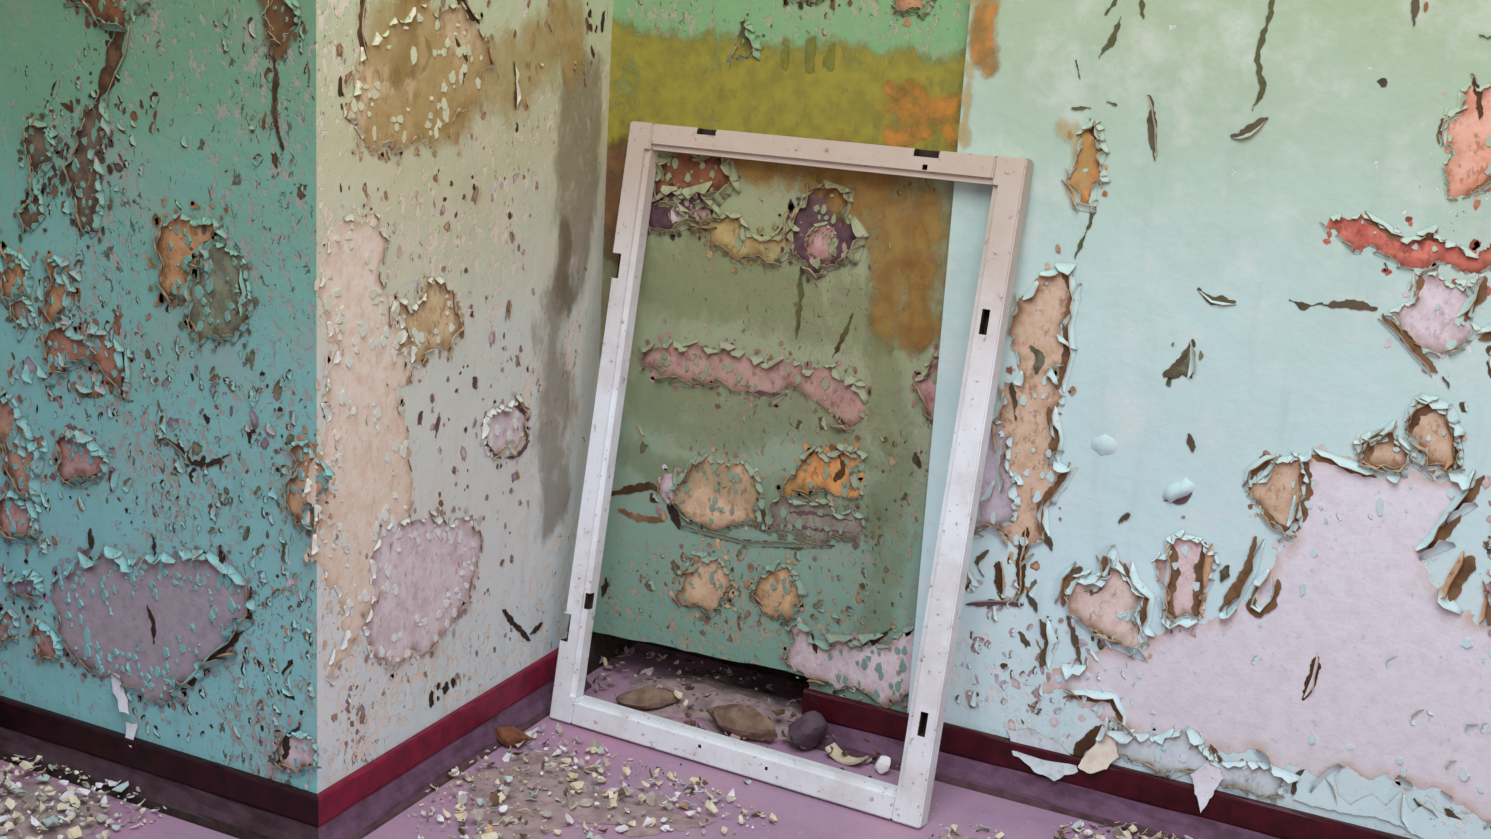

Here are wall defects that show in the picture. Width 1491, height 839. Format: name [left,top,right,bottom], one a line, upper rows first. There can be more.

peeling [513,0,605,133]
peeling [727,13,772,68]
damp [607,18,966,152]
peeling [783,0,852,36]
peeling [891,0,937,27]
peeling [1436,73,1491,211]
peeling [0,0,539,790]
peeling [632,152,923,712]
peeling [910,343,940,424]
peeling [955,211,1491,839]